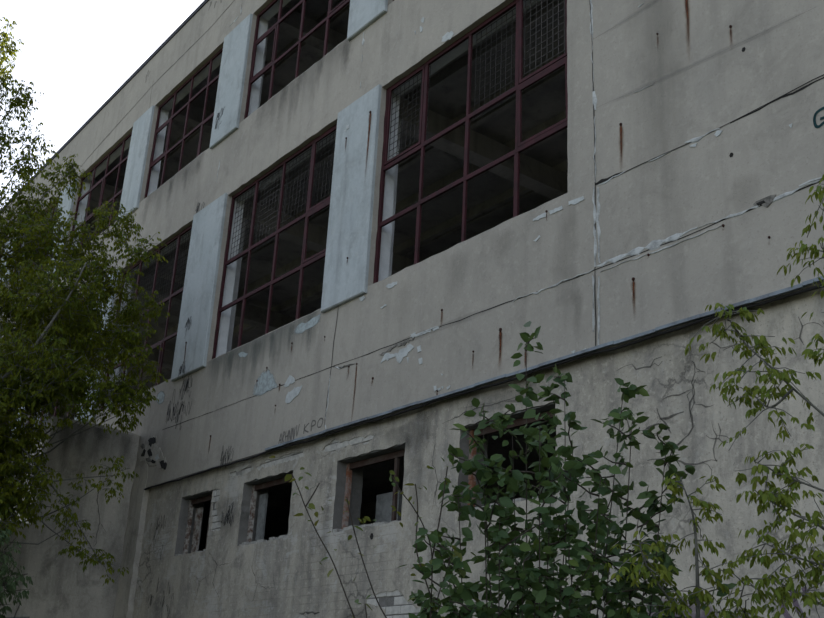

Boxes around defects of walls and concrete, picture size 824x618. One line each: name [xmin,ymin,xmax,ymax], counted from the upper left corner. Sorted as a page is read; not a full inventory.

peeling [295,314,320,334]
peeling [379,326,439,364]
crack [794,317,824,345]
crack [618,356,671,370]
crack [641,361,734,476]